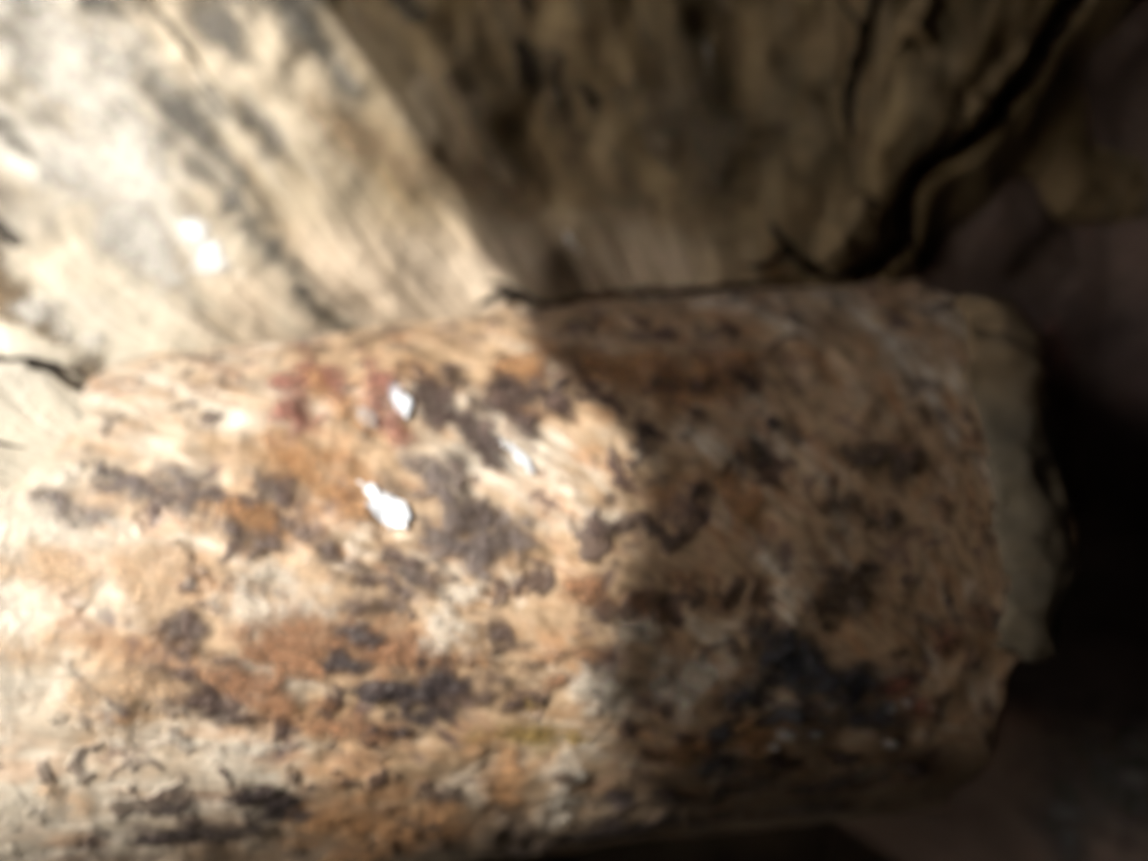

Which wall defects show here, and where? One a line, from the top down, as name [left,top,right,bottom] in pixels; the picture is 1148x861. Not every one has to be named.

crack [0,350,91,392]
crack [0,440,25,448]
corrosion [564,576,602,607]
corrosion [204,595,456,744]
corrosion [546,674,579,689]
corrosion [496,726,590,745]